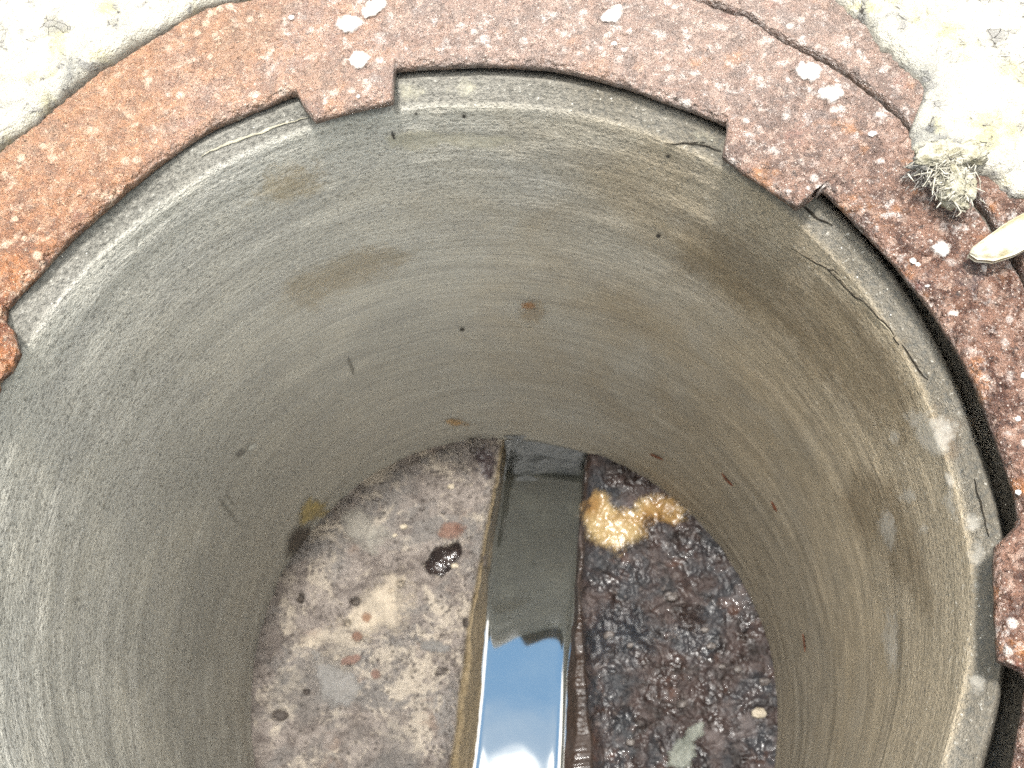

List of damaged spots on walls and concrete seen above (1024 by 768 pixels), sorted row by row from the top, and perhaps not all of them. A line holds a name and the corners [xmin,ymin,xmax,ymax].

crack [665,142,721,151]
crack [803,206,833,226]
crack [791,248,929,380]